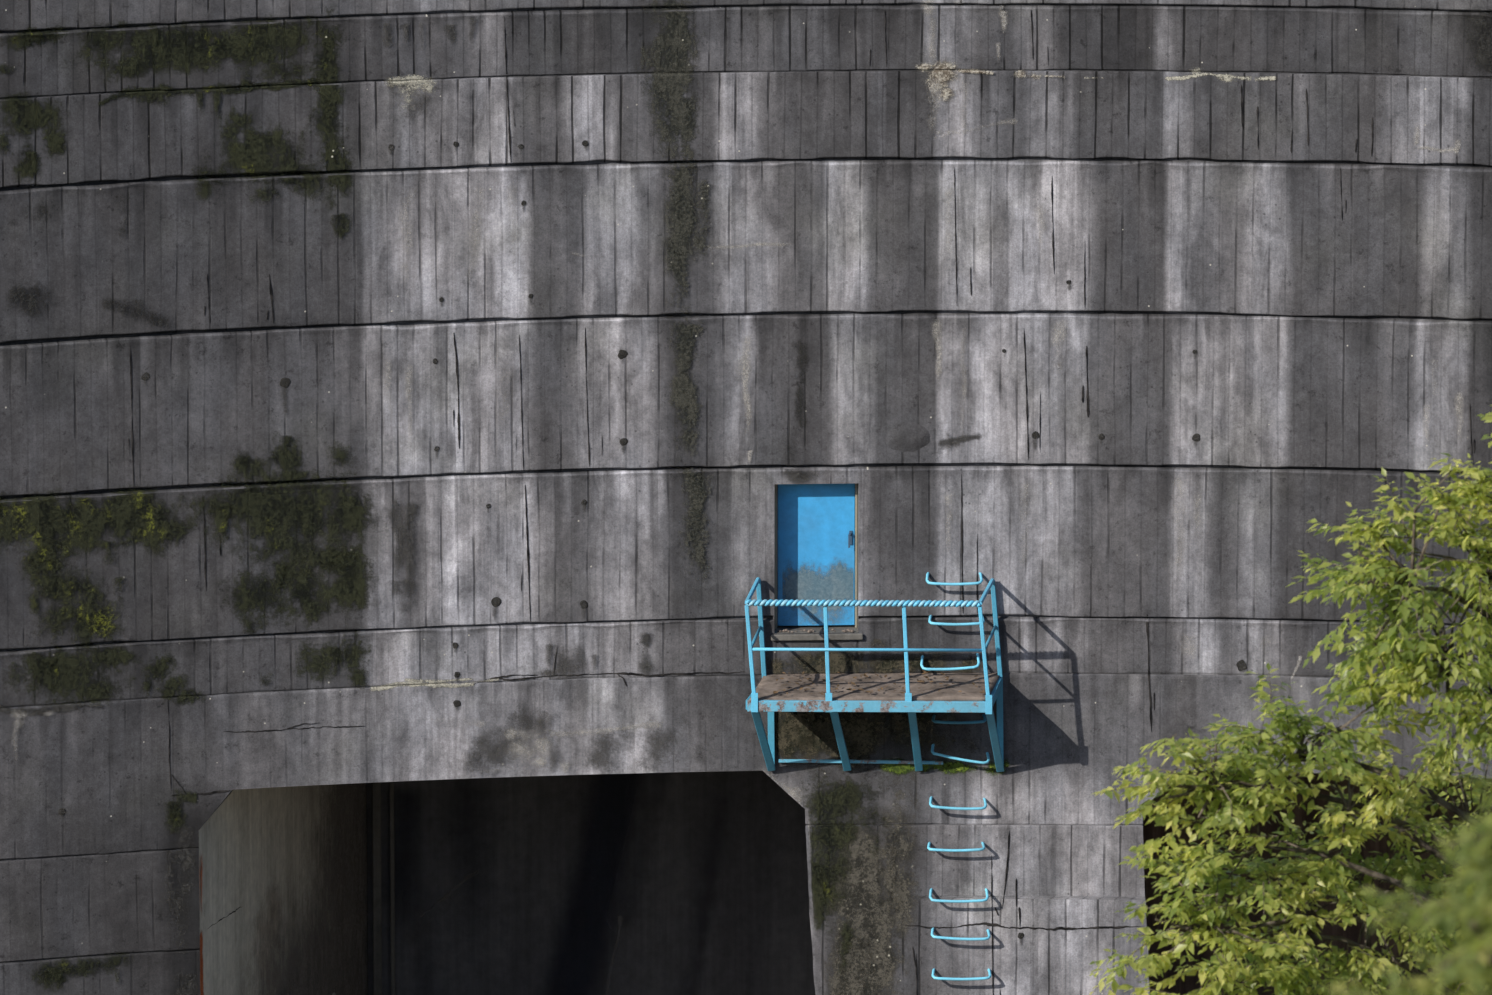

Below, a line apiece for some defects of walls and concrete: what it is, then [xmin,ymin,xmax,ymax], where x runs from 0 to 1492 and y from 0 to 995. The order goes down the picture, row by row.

leakage [640,0,713,581]
peeling [782,562,853,623]
crack [224,723,364,732]
leakage [827,775,918,995]
crack [902,833,1141,995]